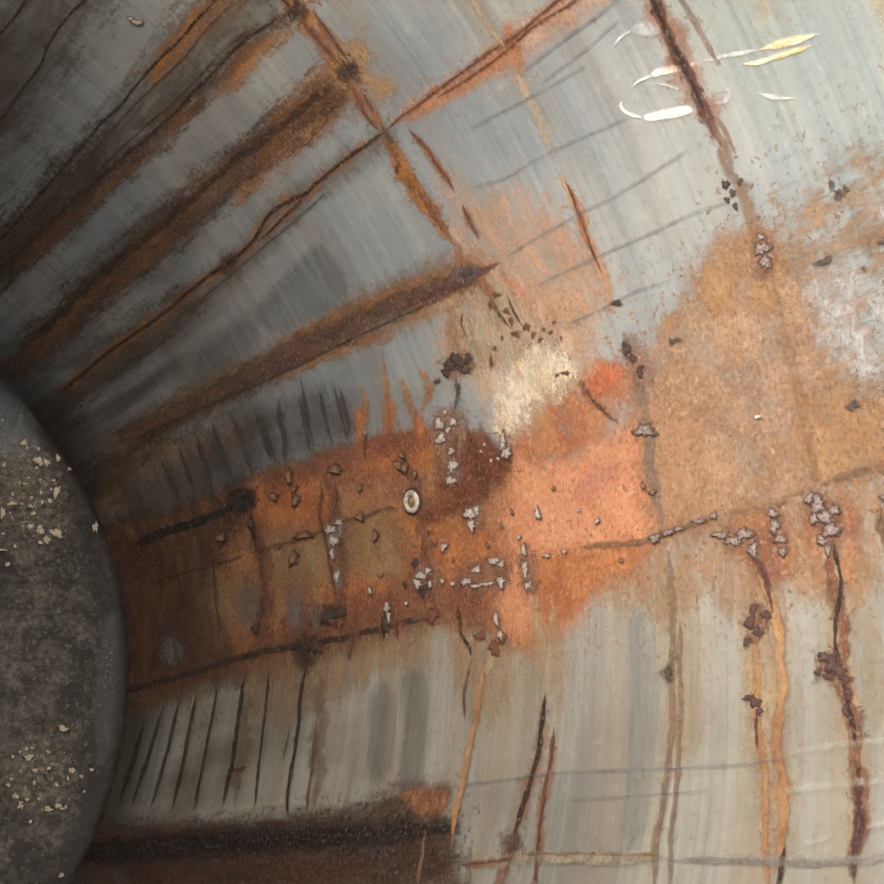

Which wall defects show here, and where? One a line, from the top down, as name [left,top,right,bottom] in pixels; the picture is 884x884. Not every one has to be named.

crack [472,0,503,45]
rust [388,0,606,129]
crack [516,72,551,150]
crack [60,0,497,393]
crack [562,178,624,309]
crack [621,333,661,509]
peeling [285,462,365,653]
peeling [381,601,392,633]
peeling [401,534,551,606]
rust [105,142,884,884]
peeling [493,610,504,641]
crack [463,495,884,884]